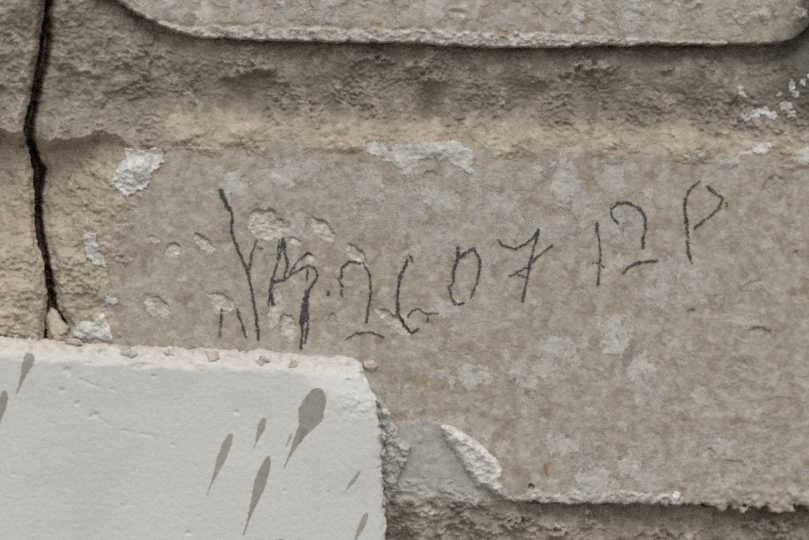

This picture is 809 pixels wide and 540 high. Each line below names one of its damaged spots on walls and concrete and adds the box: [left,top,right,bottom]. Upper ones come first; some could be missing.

crack [23,0,67,339]
water stain [111,147,165,200]
water stain [0,353,34,421]
water stain [211,434,232,484]
water stain [255,418,266,444]
water stain [284,388,326,467]
water stain [243,456,271,535]